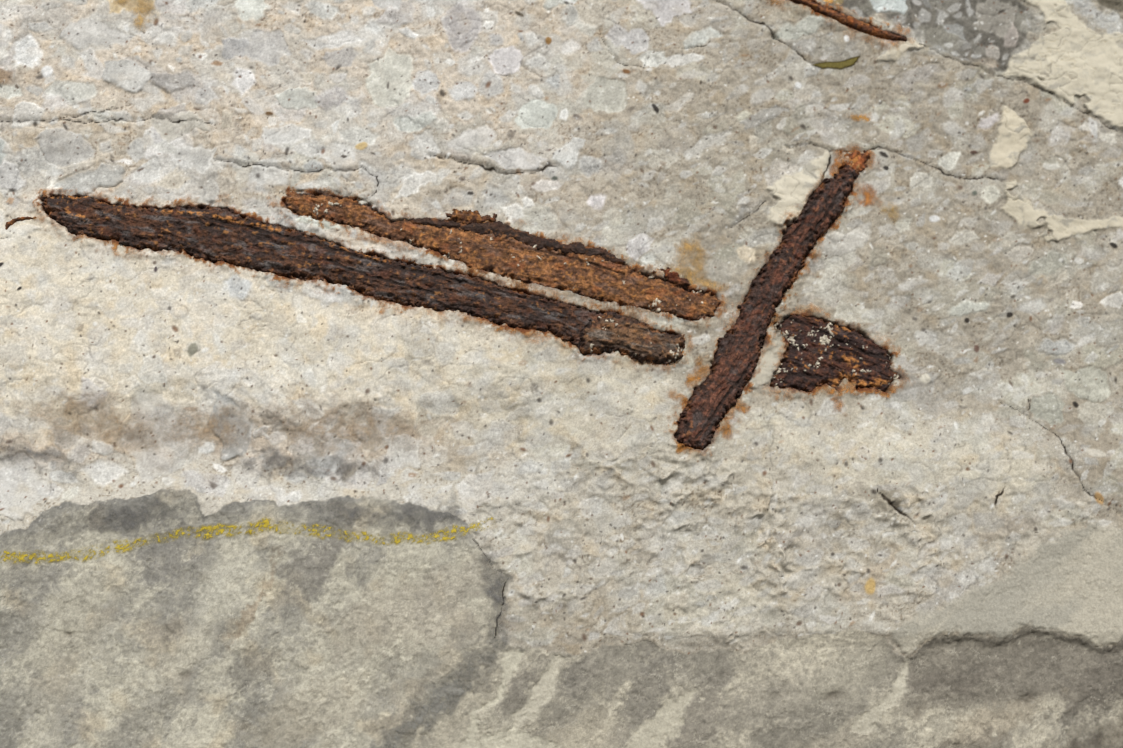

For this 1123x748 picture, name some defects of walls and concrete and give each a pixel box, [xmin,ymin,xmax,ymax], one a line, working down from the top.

crack [716,1,860,69]
corrosion [789,0,909,45]
spalling [366,48,414,108]
spalling [514,100,559,130]
spalling [35,128,95,168]
spalling [53,163,126,197]
spalling [483,148,549,171]
flaking render [767,151,830,227]
spalling [820,230,870,258]
corrosion [33,146,900,452]
crack [1010,399,1102,501]
spalling [0,453,49,522]